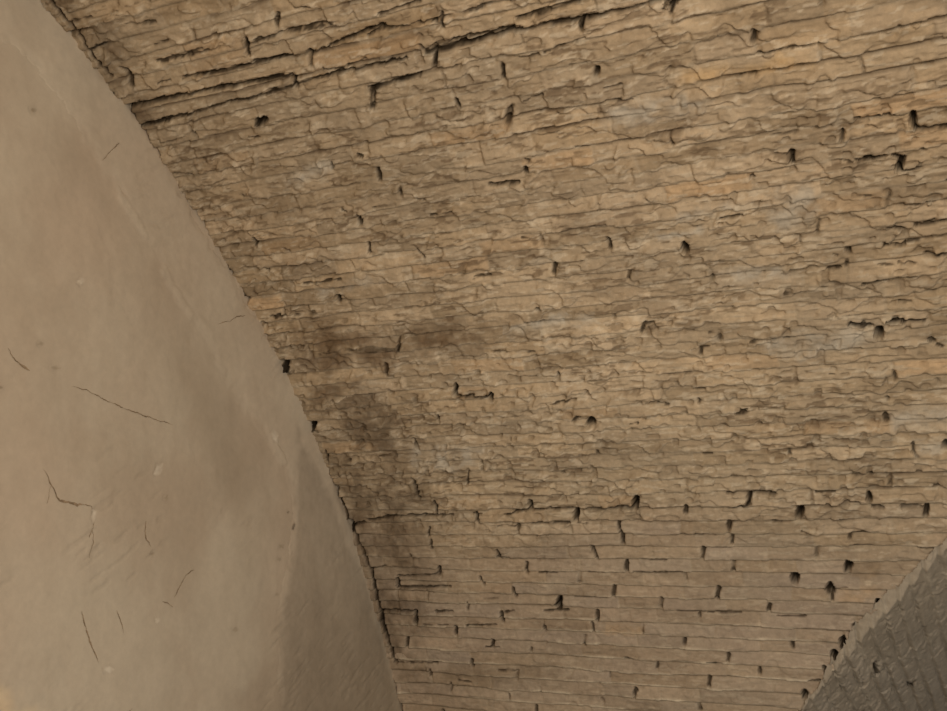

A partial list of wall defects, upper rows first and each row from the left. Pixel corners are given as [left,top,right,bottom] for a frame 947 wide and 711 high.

crack [73,386,170,424]
water stain [43,114,830,711]
crack [44,470,94,558]